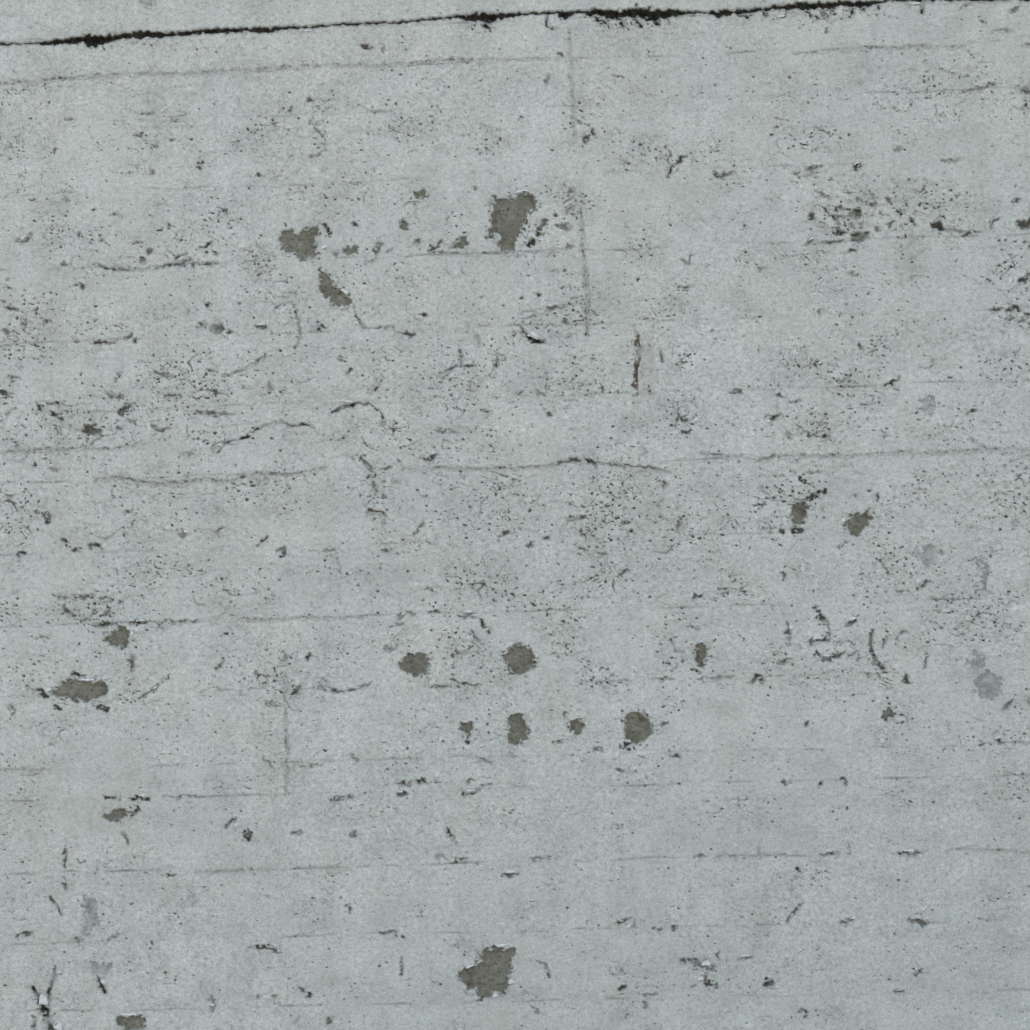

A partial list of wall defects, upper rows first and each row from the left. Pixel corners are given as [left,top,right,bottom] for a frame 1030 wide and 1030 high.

crack [0,0,1030,135]
spalling [485,189,572,252]
spalling [278,223,359,307]
spalling [778,471,827,535]
spalling [837,492,879,549]
spalling [35,671,109,713]
spalling [52,594,148,673]
spalling [383,644,481,689]
spalling [503,643,538,676]
spalling [506,713,530,746]
spalling [619,712,668,751]
spalling [458,944,516,1002]